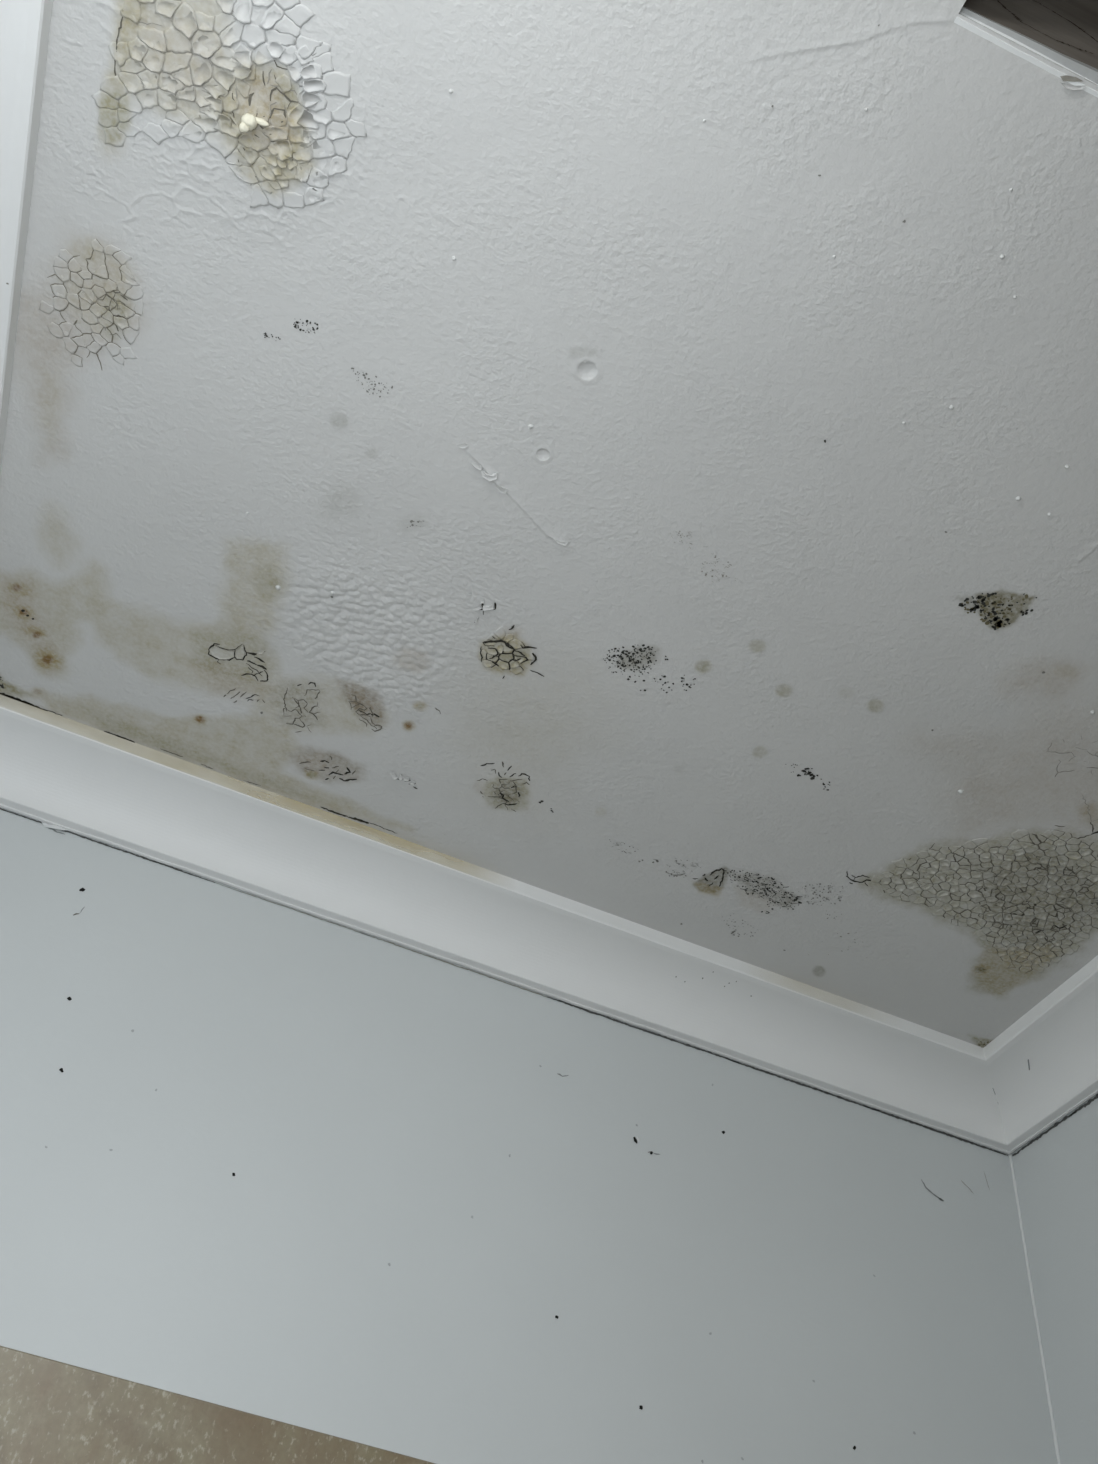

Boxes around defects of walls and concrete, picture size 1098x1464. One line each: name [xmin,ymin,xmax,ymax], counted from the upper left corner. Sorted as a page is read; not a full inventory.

peeling [39,0,431,297]
crack [208,643,386,781]
water stain [0,205,716,853]
water stain [609,643,1098,1004]
crack [846,737,1098,973]
water stain [952,586,1041,634]